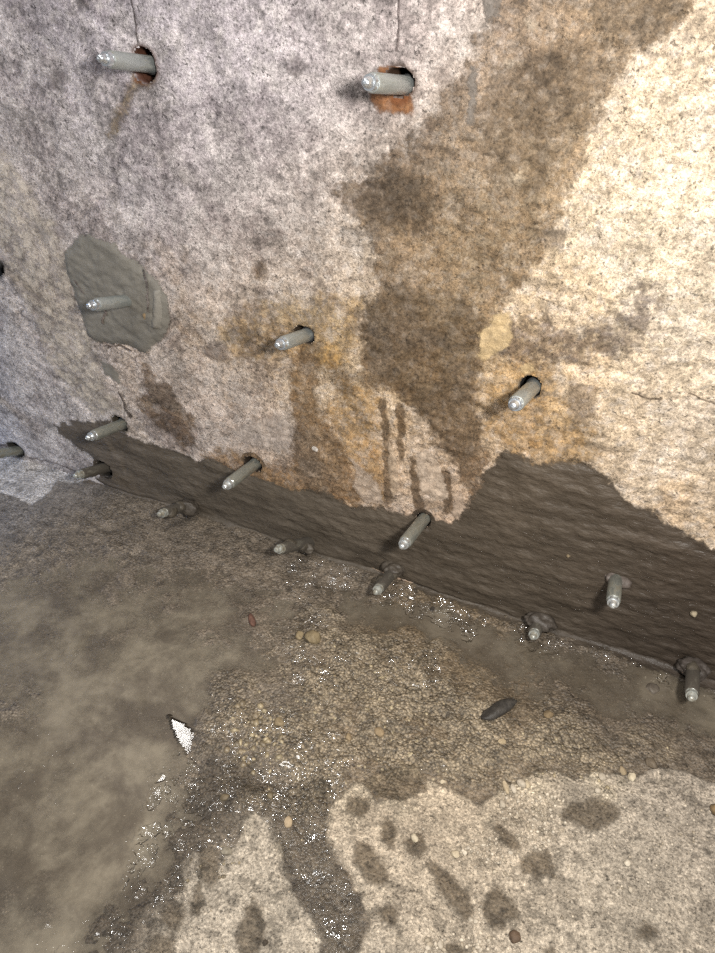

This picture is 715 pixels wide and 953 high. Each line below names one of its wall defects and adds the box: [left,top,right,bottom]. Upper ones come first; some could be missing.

rust [371,93,413,114]
water stain [333,0,694,513]
rust [217,291,365,373]
rust [206,447,307,491]
water stain [289,343,362,507]
rust [327,378,384,500]
water stain [0,480,715,953]